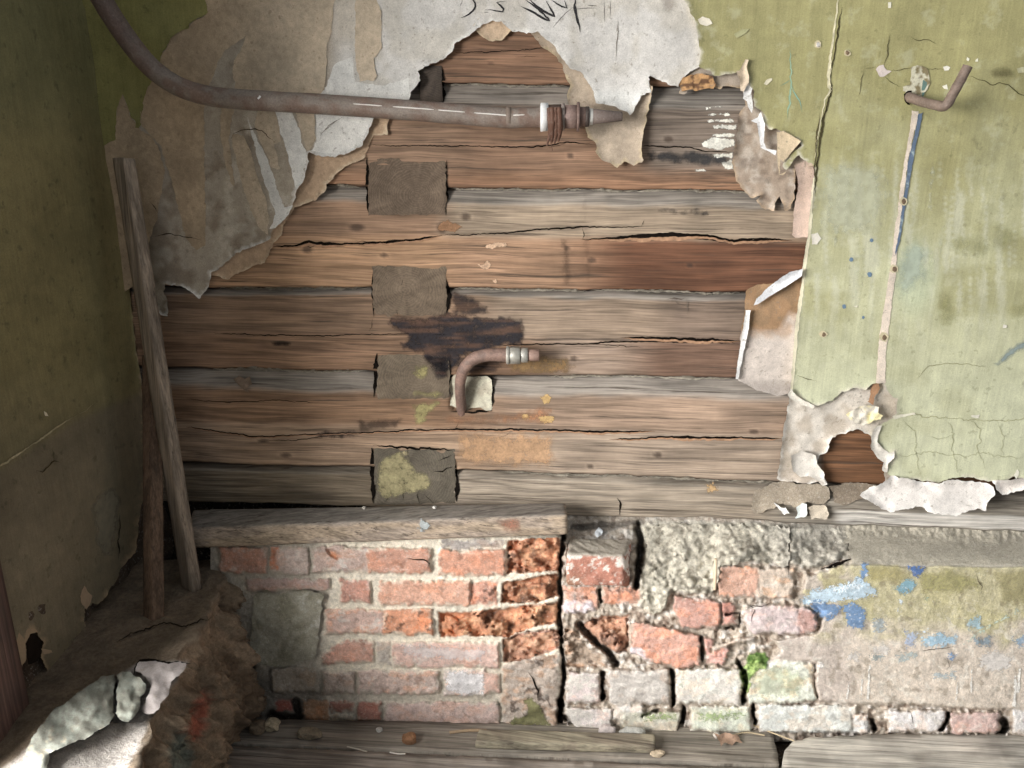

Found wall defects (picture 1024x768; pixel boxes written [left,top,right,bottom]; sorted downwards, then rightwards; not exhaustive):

peeling [82,0,373,316]
crack [813,0,842,193]
crack [274,221,792,249]
peeling [321,0,1024,517]
crack [900,413,1024,471]
spalling [17,627,52,665]
spalling [449,537,561,661]